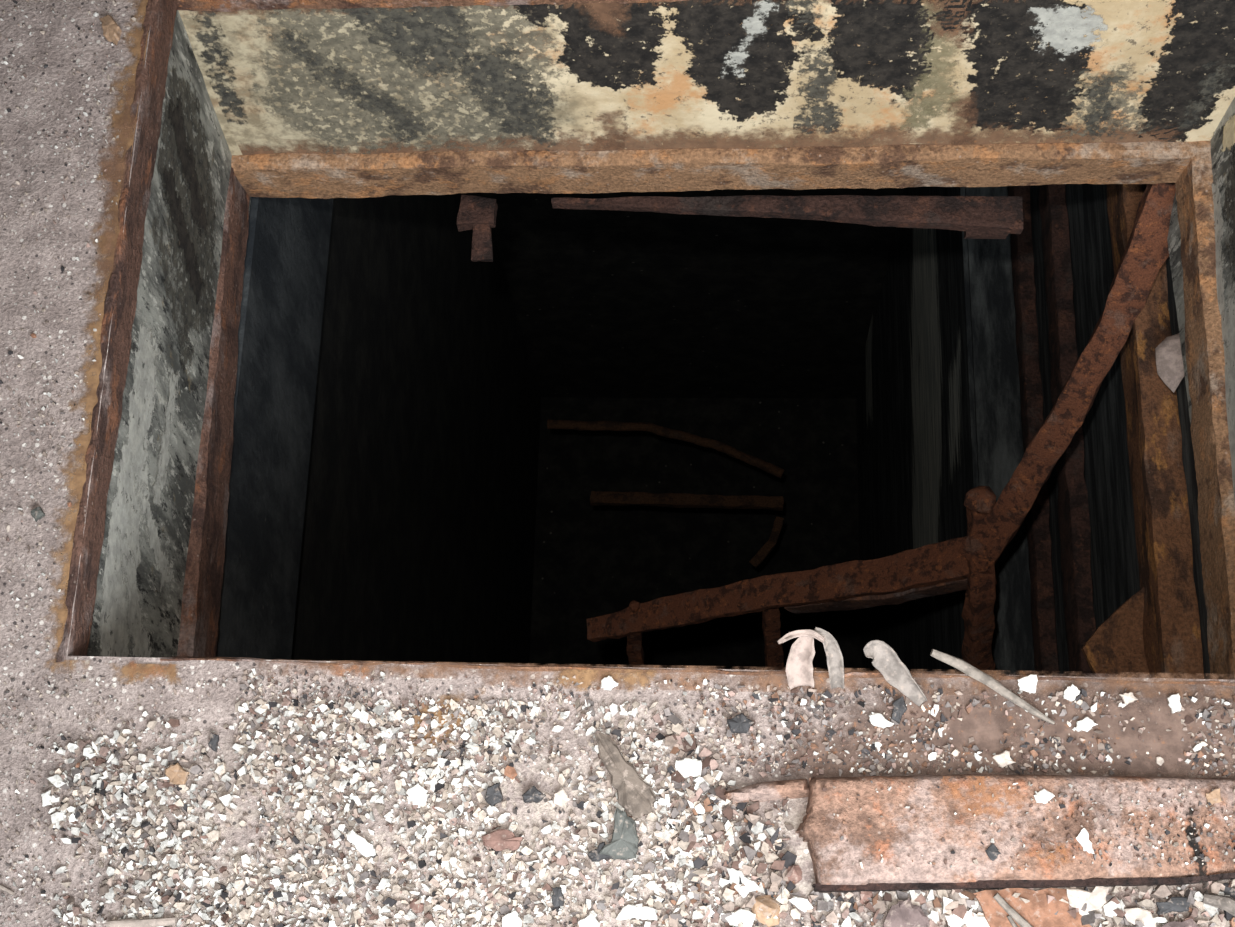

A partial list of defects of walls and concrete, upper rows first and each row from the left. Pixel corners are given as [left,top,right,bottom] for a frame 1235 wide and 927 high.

corrosion [551,3,625,33]
corrosion [897,0,980,48]
water stain [203,50,244,117]
water stain [269,30,430,143]
water stain [343,6,556,151]
corrosion [240,97,1178,155]
water stain [901,1,960,129]
water stain [1084,76,1126,137]
water stain [152,98,209,371]
corrosion [47,0,150,671]
corrosion [300,660,464,678]
corrosion [481,665,722,692]